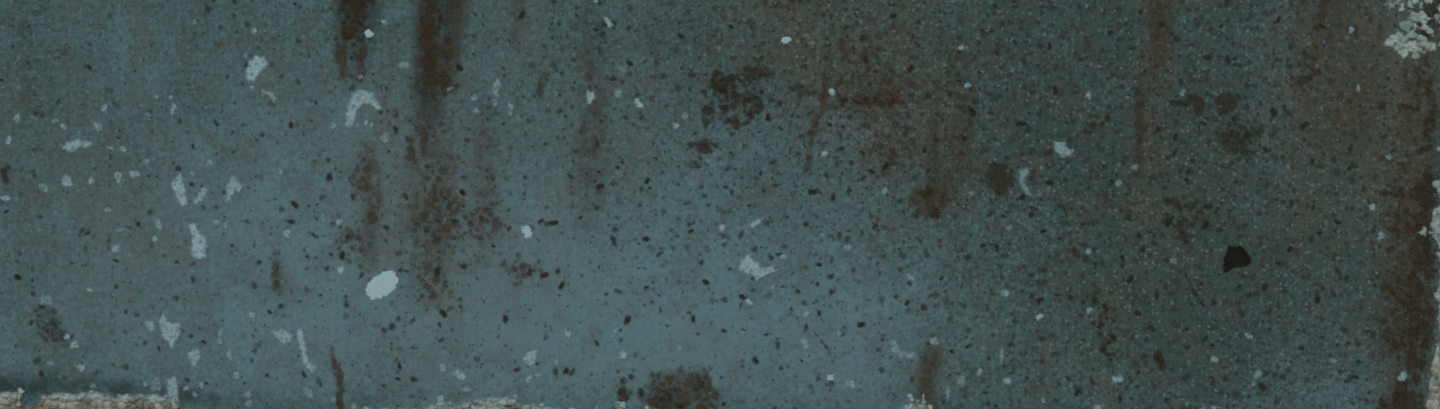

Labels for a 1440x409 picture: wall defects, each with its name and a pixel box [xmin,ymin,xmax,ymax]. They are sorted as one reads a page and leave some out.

rust [415,0,463,103]
rust [1417,0,1440,39]
rust [805,35,916,172]
peeling [1054,140,1074,157]
peeling [719,218,786,289]
spalling [1203,205,1268,297]
rust [1375,169,1436,409]
spalling [0,365,203,409]
peeling [145,314,252,407]
spalling [330,350,575,409]
rust [617,379,629,402]
rust [646,371,718,409]